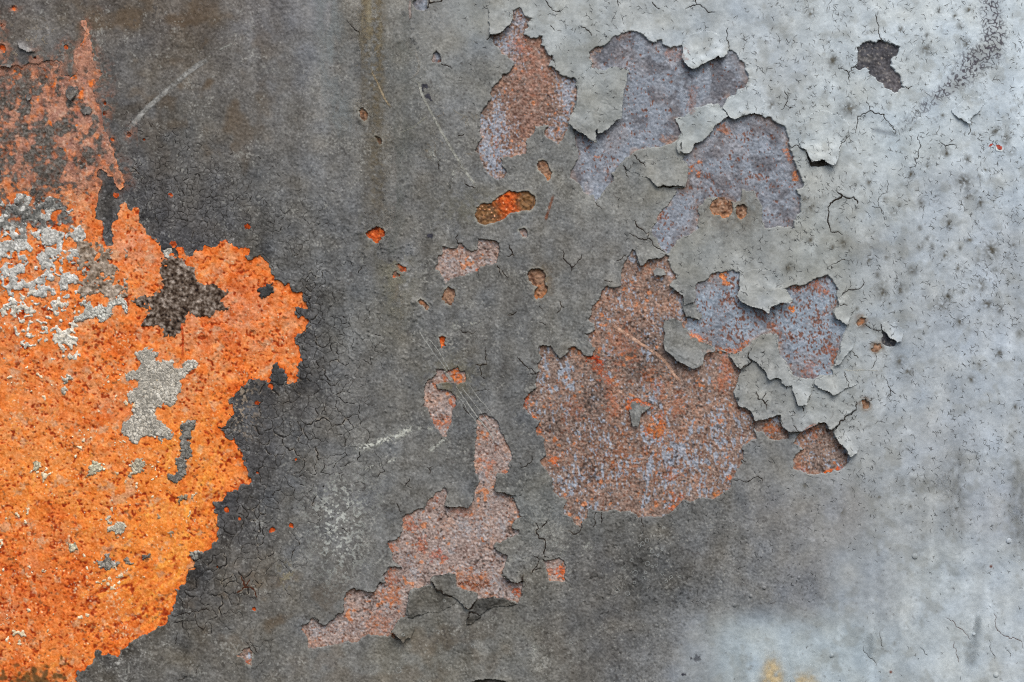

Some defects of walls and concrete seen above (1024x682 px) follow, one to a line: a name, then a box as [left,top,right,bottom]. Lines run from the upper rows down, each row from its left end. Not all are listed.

peeling [855,41,904,93]
peeling [951,95,987,124]
rust [0,20,309,682]
crack [95,102,433,667]
peeling [423,367,466,437]
peeling [436,239,500,305]
peeling [475,0,869,527]
peeling [302,413,528,649]